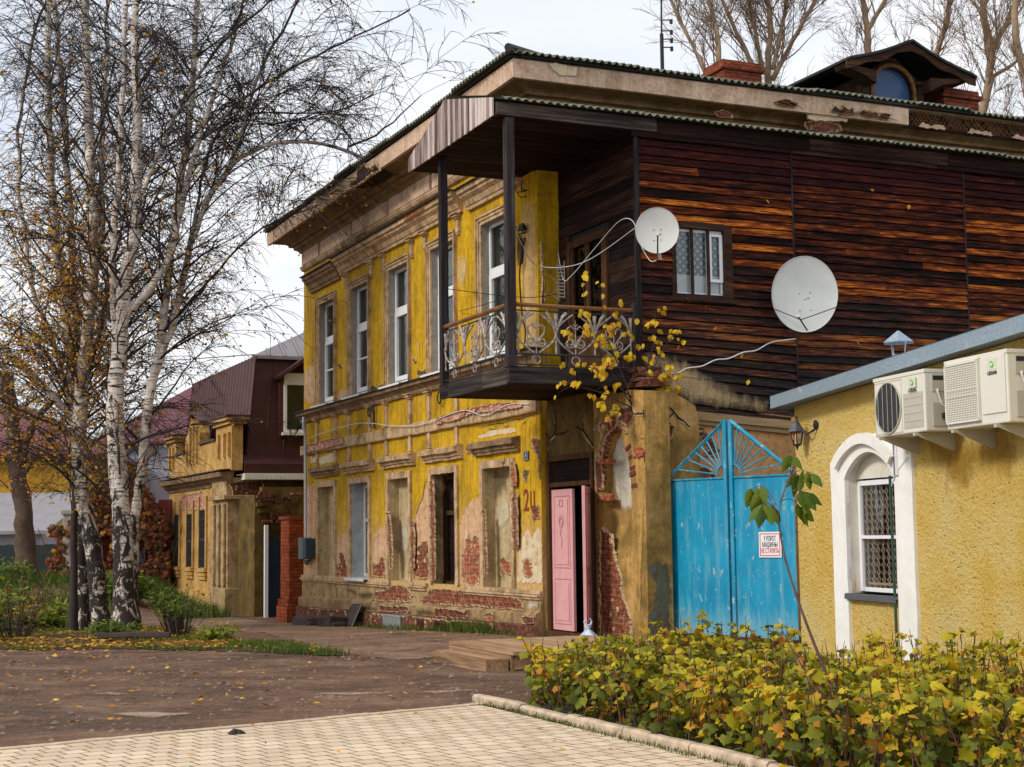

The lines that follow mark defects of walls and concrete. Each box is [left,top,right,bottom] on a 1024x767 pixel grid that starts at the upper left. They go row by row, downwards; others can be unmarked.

spalling [804,114,849,134]
spalling [435,401,523,425]
crack [463,407,594,449]
spalling [592,406,635,501]
spalling [370,436,543,631]
spalling [598,526,633,639]